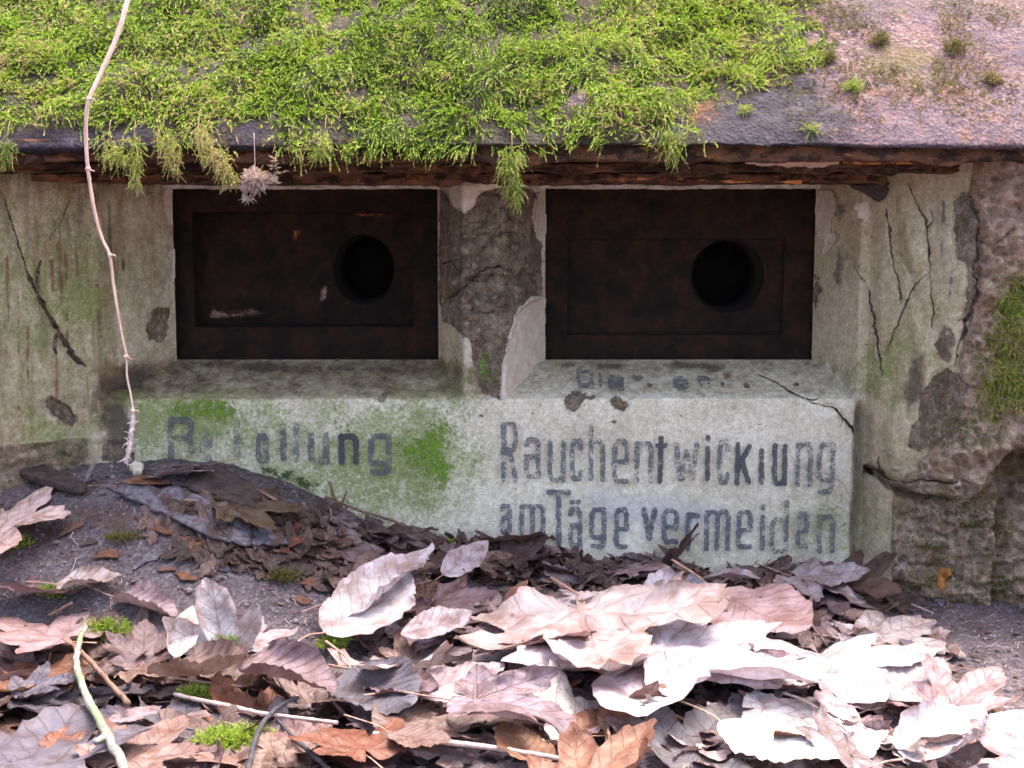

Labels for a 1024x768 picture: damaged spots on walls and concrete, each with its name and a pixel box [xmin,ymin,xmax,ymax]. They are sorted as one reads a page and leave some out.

crack [1,192,87,367]
spalling [146,307,171,343]
spalling [437,185,547,399]
crack [854,184,1010,375]
spalling [953,192,984,313]
spalling [46,398,78,425]
crack [754,374,854,432]
crack [863,456,958,485]
spalling [908,326,970,452]